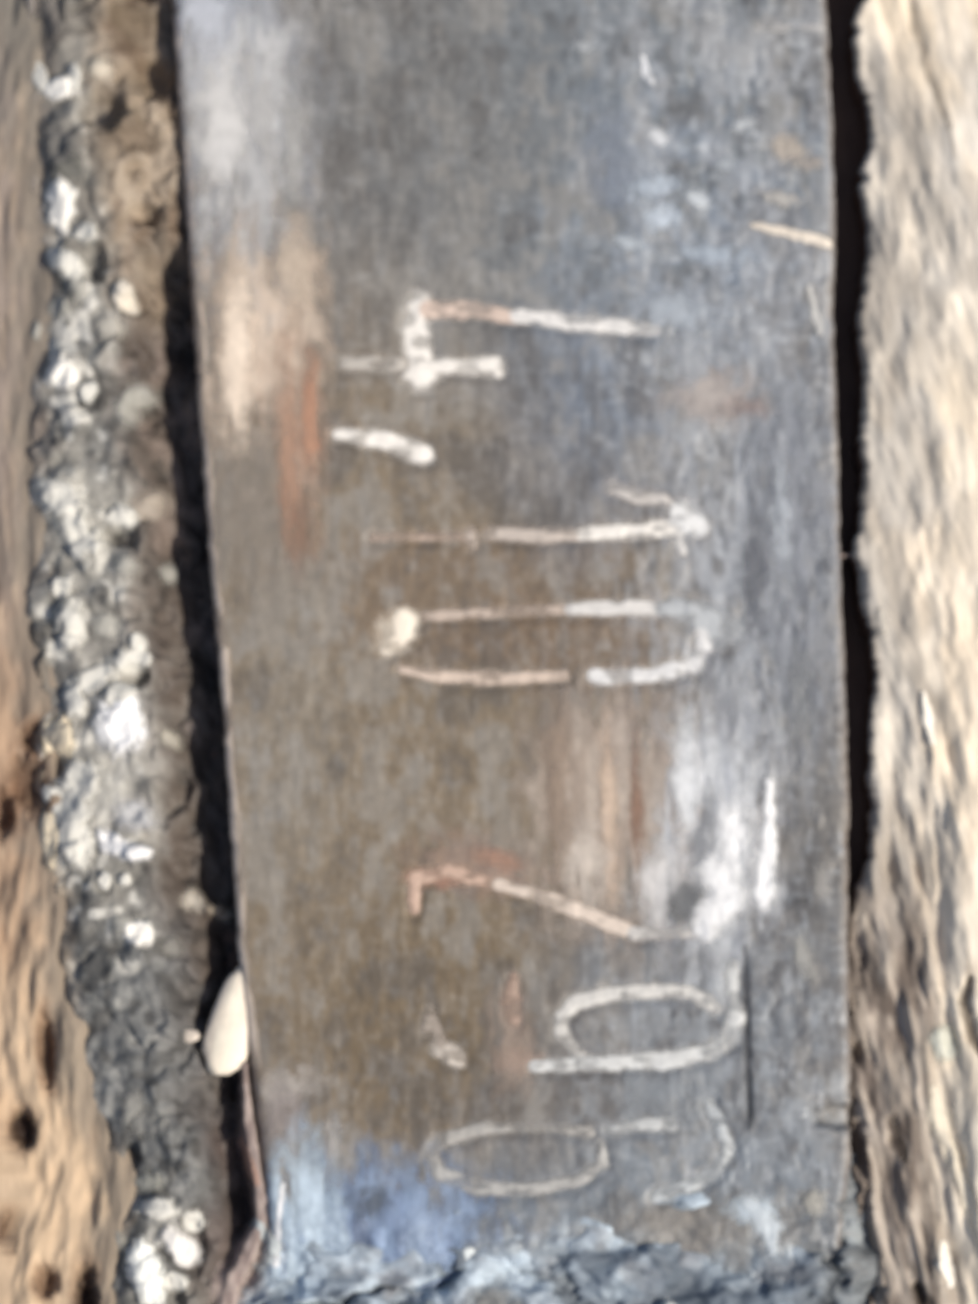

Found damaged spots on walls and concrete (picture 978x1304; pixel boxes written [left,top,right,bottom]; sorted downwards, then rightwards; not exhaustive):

water stain [32,58,111,101]
water stain [31,175,97,341]
water stain [95,279,139,339]
water stain [43,355,98,403]
water stain [116,386,156,426]
water stain [35,476,166,576]
water stain [162,565,178,582]
water stain [39,575,199,890]
water stain [183,890,234,920]
water stain [112,916,180,955]